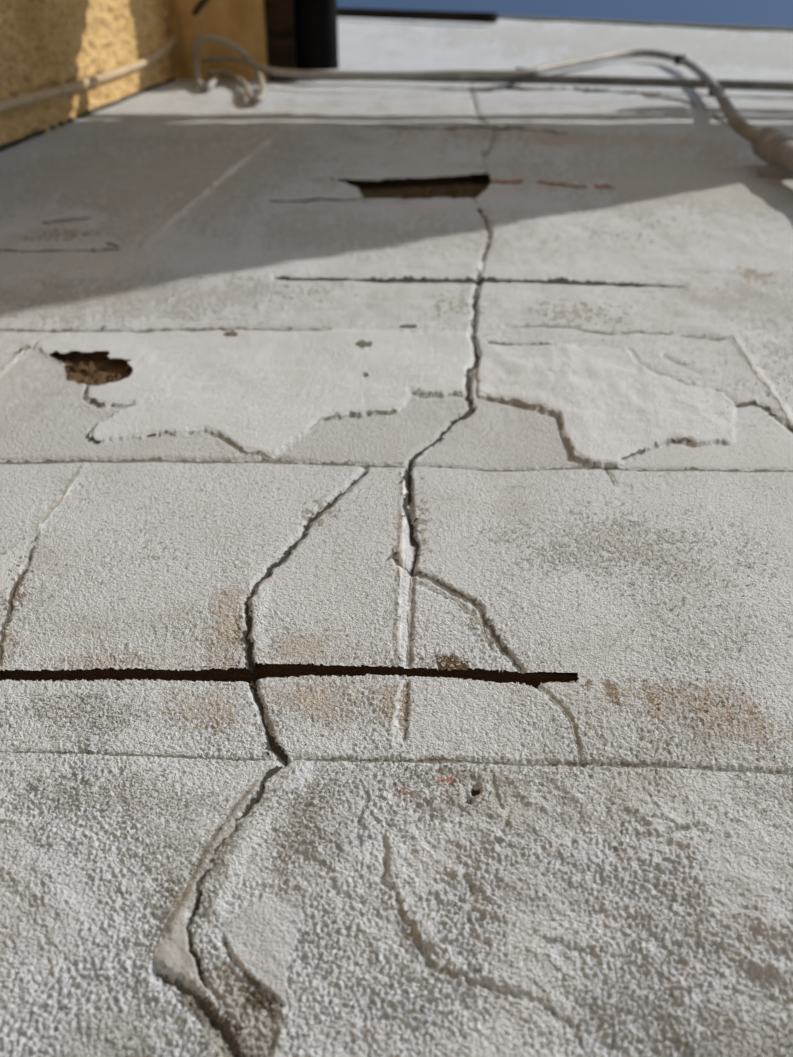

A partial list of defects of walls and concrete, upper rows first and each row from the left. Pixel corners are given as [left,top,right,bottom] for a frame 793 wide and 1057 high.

spalling [331,171,491,203]
crack [366,85,729,189]
crack [506,321,733,341]
peeling [0,352,590,471]
peeling [621,350,793,472]
crack [387,208,582,767]
crack [0,464,84,660]
rust [25,550,423,746]
crack [156,471,368,1057]
crack [490,773,509,830]
crack [641,828,686,837]
crack [381,845,586,1057]